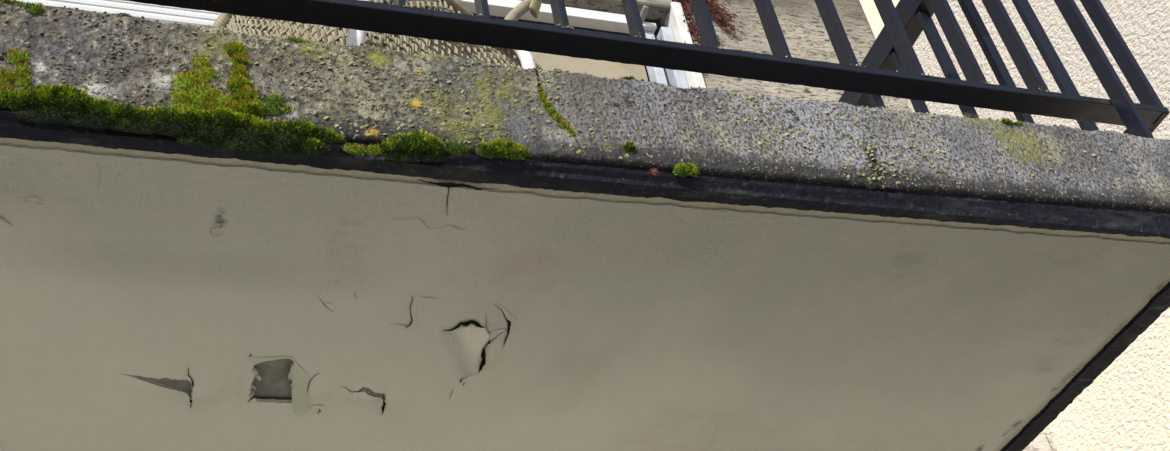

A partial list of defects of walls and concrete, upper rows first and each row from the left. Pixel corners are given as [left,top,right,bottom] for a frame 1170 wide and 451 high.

crack [395,179,496,230]
peeling [113,302,528,421]